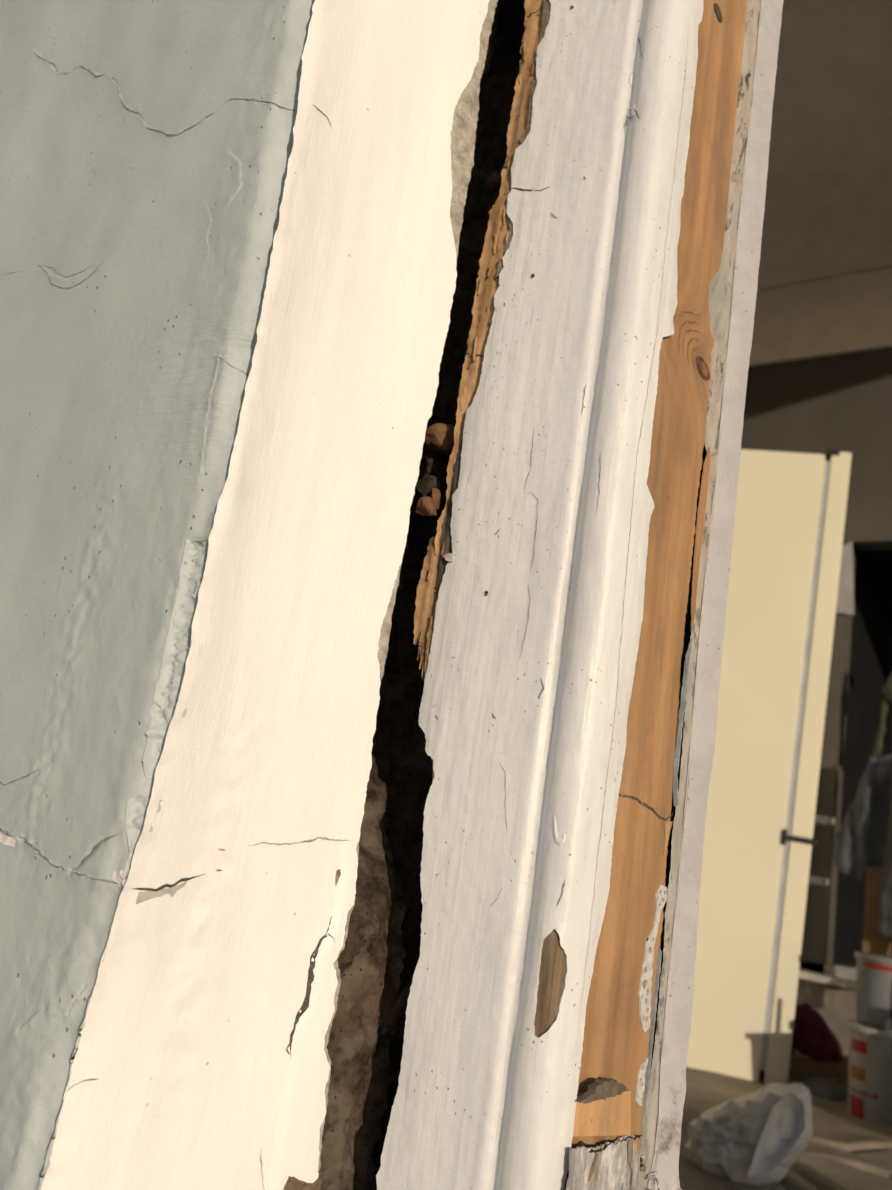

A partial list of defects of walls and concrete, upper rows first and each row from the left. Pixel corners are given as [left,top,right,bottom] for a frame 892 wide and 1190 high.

peeling [539,0,551,43]
crack [36,54,332,136]
flaking render [450,0,498,259]
peeling [519,79,537,144]
crack [7,264,99,289]
flaking render [377,557,403,681]
crack [0,828,204,891]
crack [248,837,349,846]
crack [286,917,335,1055]
peeling [534,929,565,1037]
peeling [628,884,667,1190]
flaking render [284,1170,326,1190]